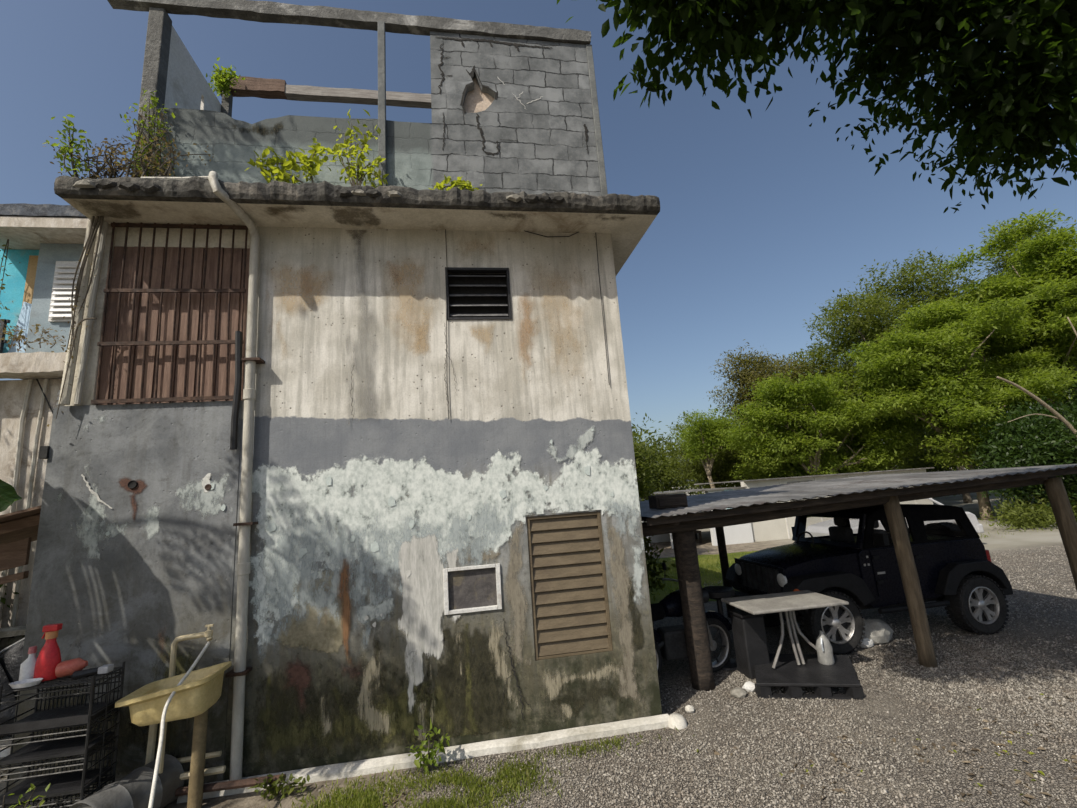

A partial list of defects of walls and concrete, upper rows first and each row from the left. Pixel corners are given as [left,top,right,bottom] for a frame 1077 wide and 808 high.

spalling [460,70,498,114]
crack [438,37,552,155]
peeling [71,475,127,558]
peeling [145,506,159,538]
peeling [176,473,230,515]
peeling [249,427,645,700]
damp [447,549,458,568]
corrosion [339,560,351,663]
damp [628,577,644,650]
damp [255,615,518,764]
damp [545,664,634,717]